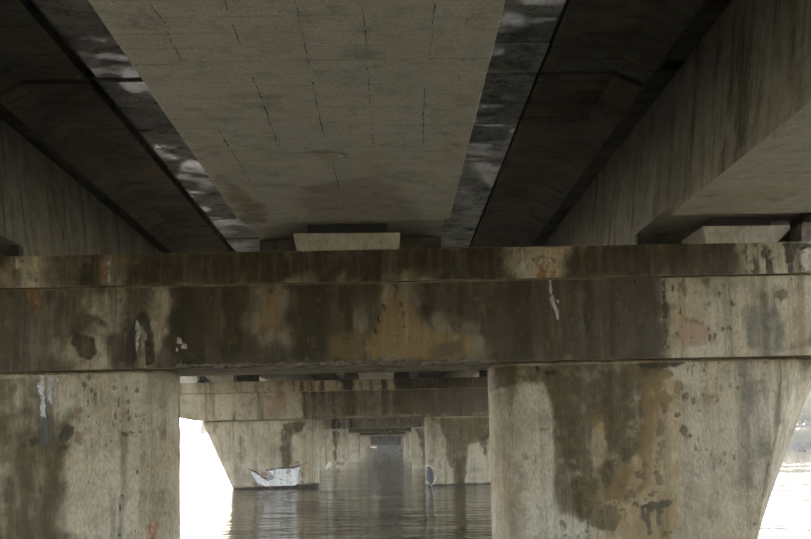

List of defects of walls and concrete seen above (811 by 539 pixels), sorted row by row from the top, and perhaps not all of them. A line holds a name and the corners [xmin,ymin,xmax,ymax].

water stain [0,255,112,539]
water stain [107,243,740,536]
water stain [751,244,774,274]